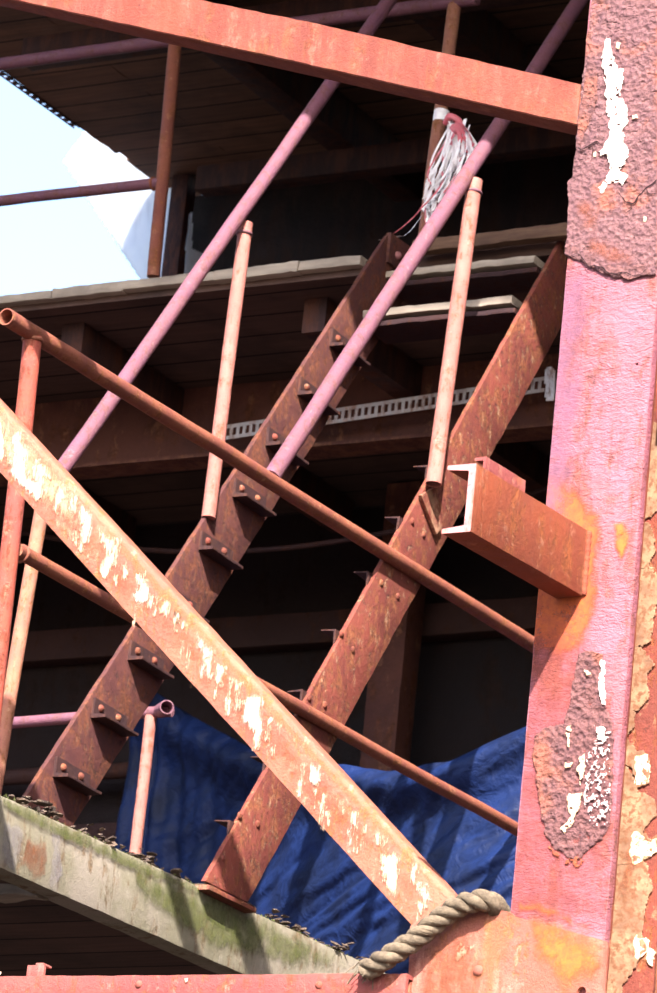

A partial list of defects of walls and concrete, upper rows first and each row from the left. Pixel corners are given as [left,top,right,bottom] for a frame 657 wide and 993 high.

peeling [564,36,657,281]
peeling [0,413,282,756]
rust [534,481,599,653]
rust [615,523,628,558]
peeling [560,422,657,993]
peeling [296,764,432,922]
rust [520,904,599,982]